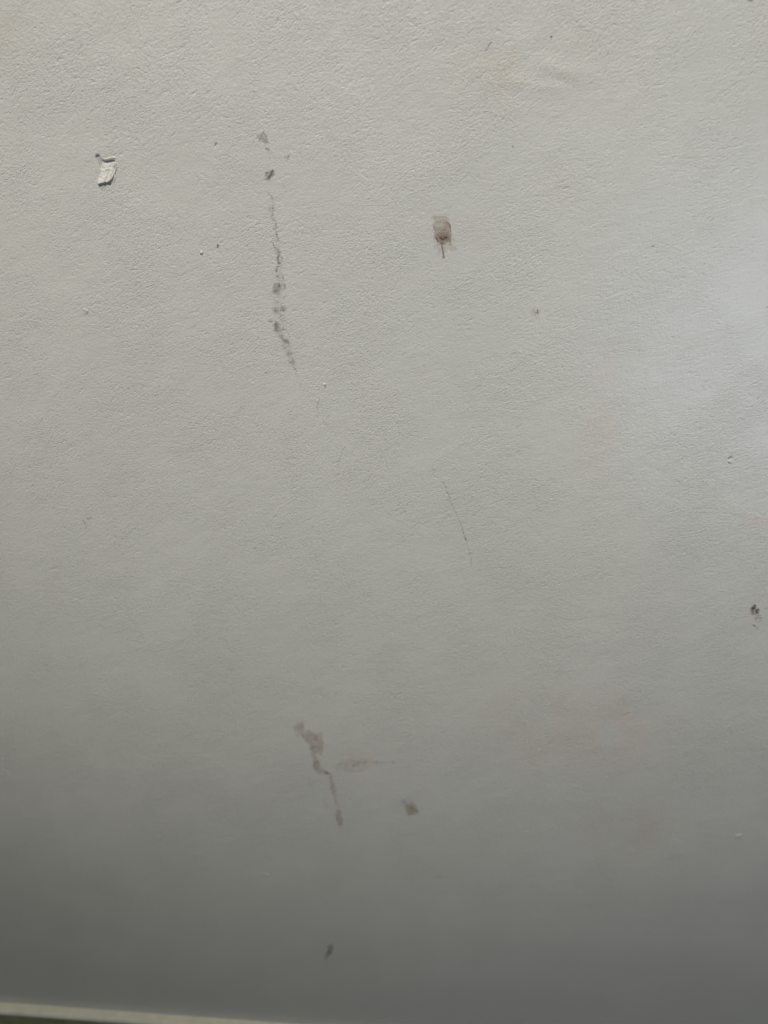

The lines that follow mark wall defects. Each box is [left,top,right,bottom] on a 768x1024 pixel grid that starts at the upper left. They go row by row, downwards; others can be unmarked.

peeling [97,156,117,185]